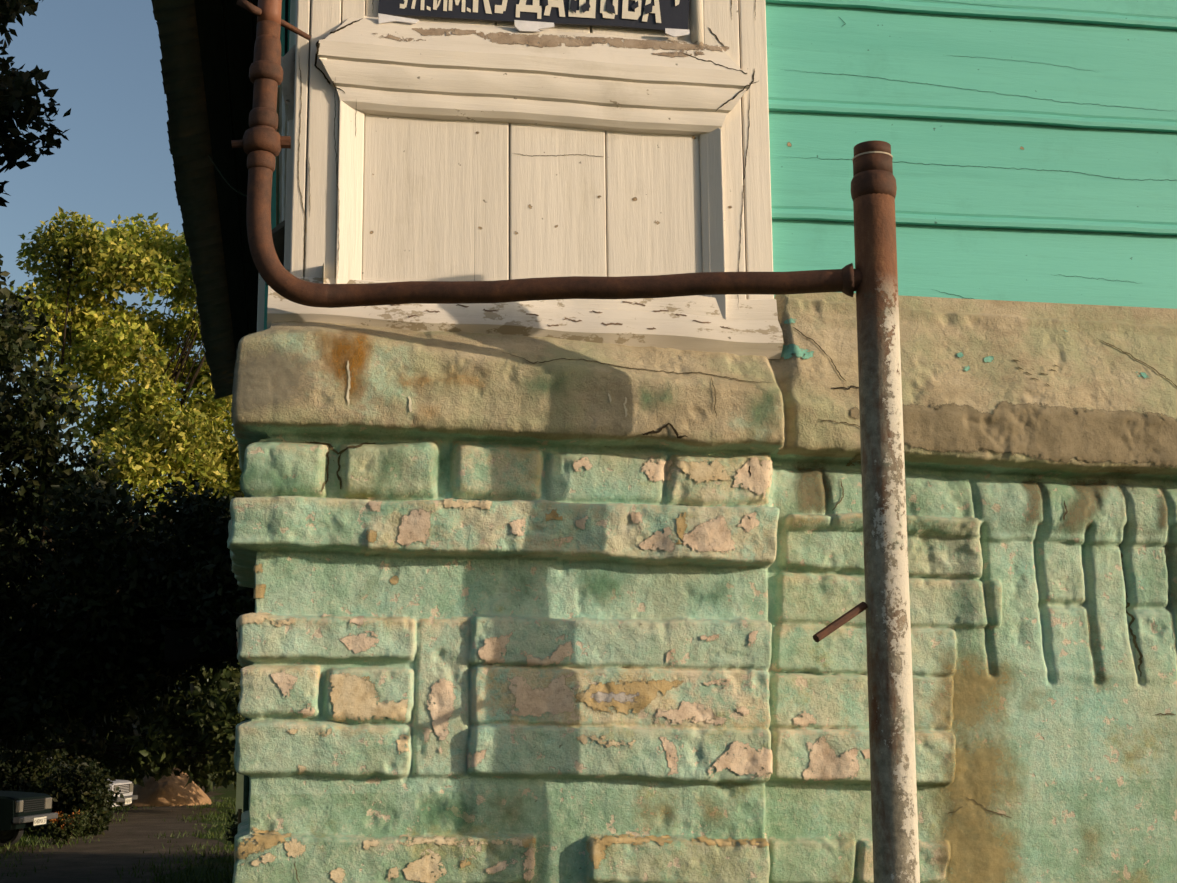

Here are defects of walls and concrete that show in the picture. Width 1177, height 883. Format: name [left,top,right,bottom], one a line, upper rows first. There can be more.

peeling [526,311,622,327]
crack [1098,339,1177,387]
crack [305,441,376,492]
peeling [395,498,492,548]
peeling [638,456,773,554]
crack [1119,542,1143,677]
peeling [477,632,513,665]
peeling [506,641,750,776]
peeling [708,741,773,778]
peeling [793,711,870,783]
peeling [234,827,306,867]
peeling [387,806,537,883]